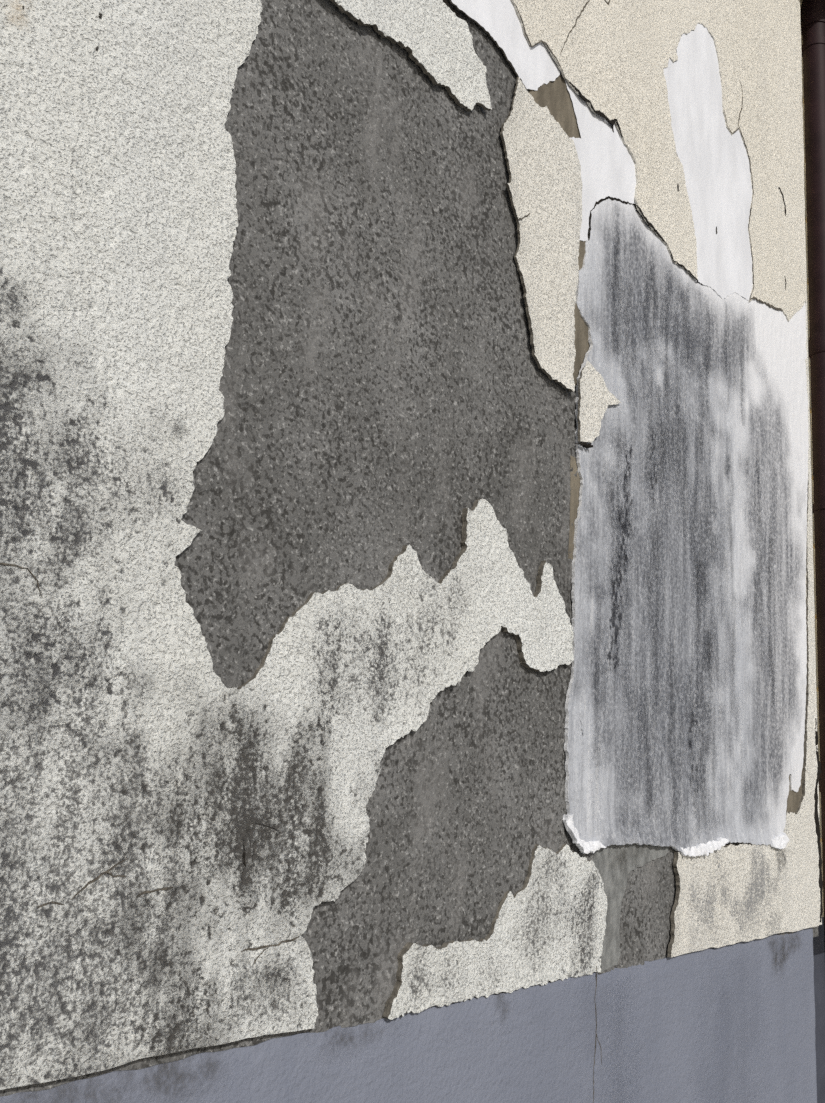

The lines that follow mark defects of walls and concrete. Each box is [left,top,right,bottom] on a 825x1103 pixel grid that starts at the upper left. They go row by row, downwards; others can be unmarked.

crack [515,0,623,137]
damp [606,225,748,377]
damp [0,269,468,1088]
spalling [175,0,809,1033]
damp [595,382,722,842]
damp [750,414,797,794]
damp [507,847,600,978]
crack [593,966,602,1102]